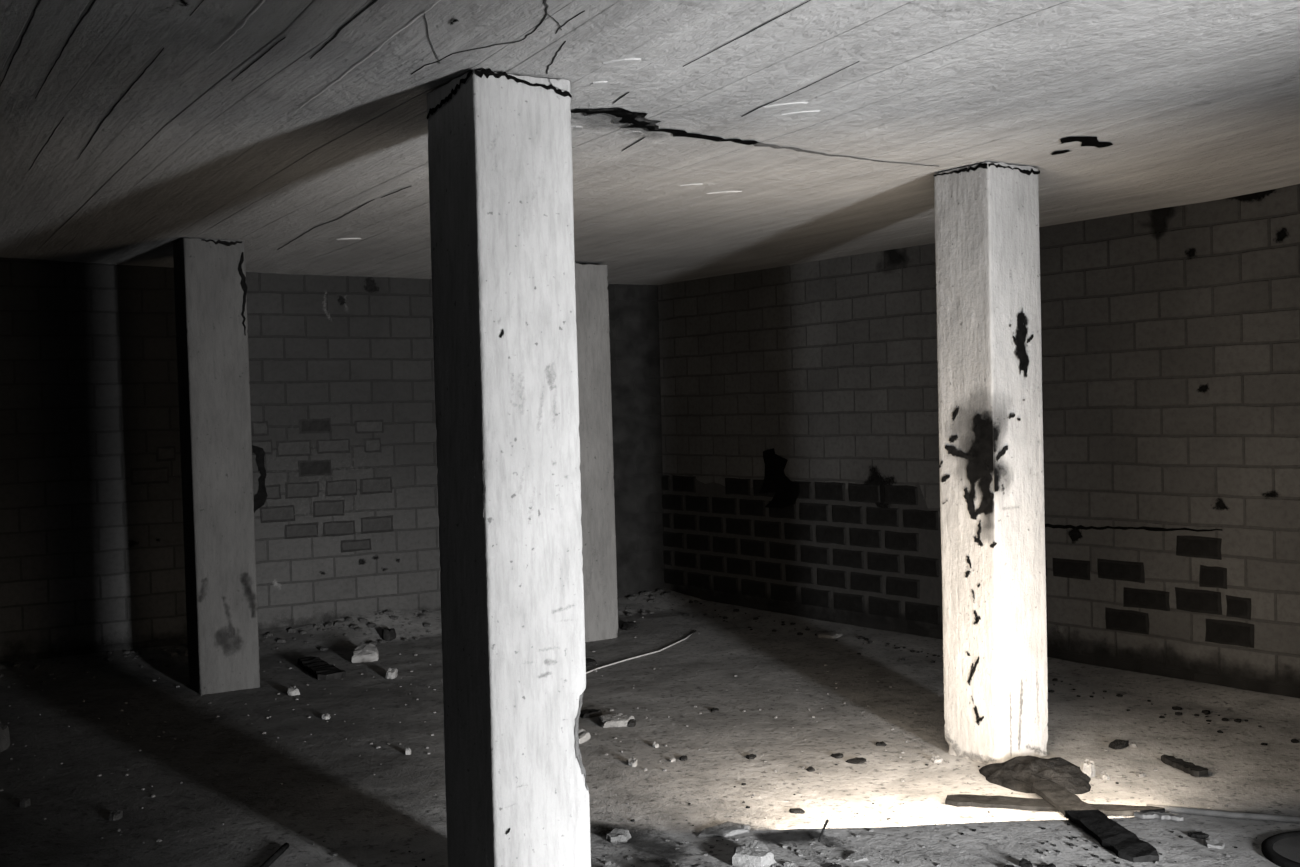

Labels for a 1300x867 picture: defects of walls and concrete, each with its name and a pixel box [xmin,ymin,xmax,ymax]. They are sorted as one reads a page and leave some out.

crack [232,37,286,80]
crack [310,0,378,59]
crack [411,0,1113,177]
crack [277,186,411,250]
crack [201,239,248,336]
peeling [251,418,400,571]
damp [965,520,997,625]
damp [967,652,984,726]
spalling [575,689,589,790]